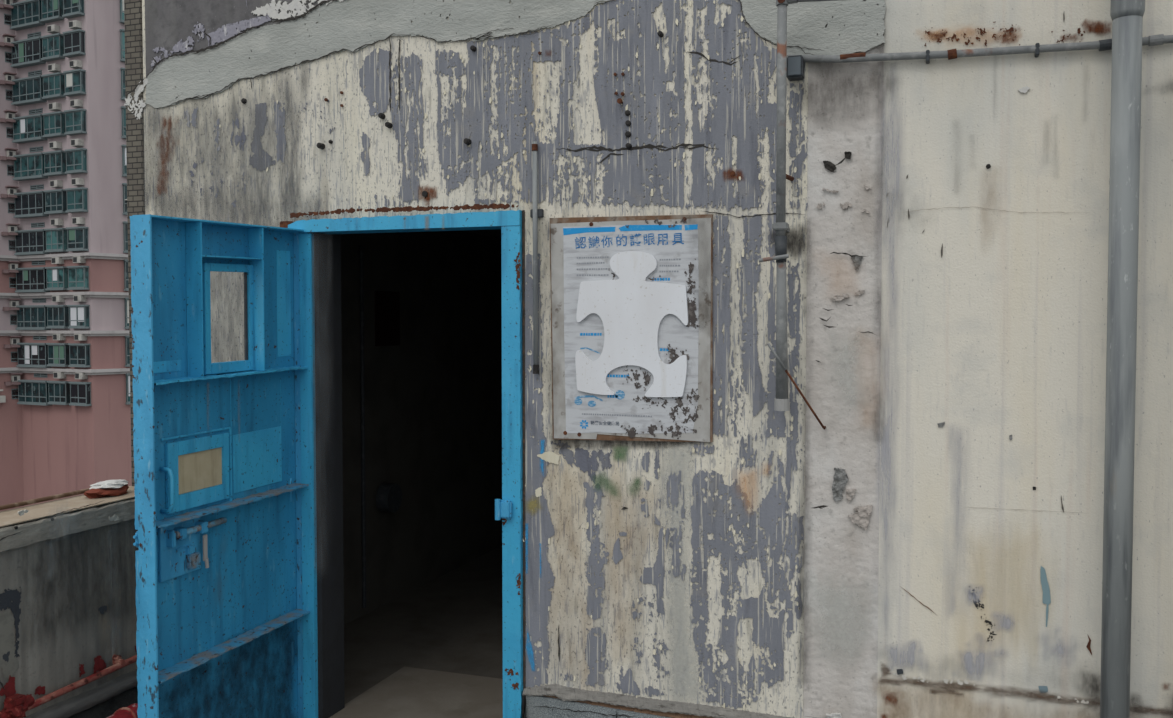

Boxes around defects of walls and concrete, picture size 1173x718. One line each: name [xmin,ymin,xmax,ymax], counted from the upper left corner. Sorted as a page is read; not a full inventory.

peeling [124,0,348,120]
corrosion [921,22,1025,47]
corrosion [1051,21,1110,43]
peeling [184,99,336,214]
crack [556,143,716,163]
spalling [823,152,852,172]
corrosion [280,187,519,228]
peeling [346,0,808,710]
spalling [832,468,872,531]
peeling [0,587,21,662]